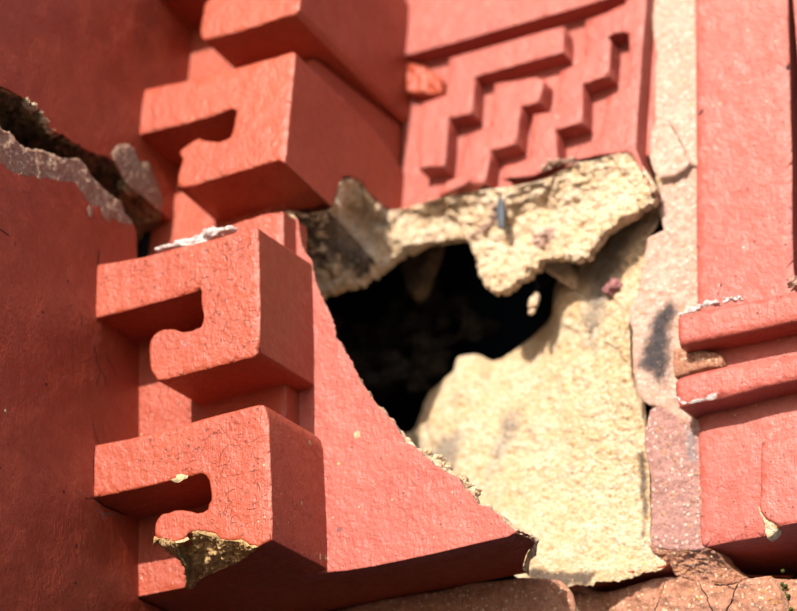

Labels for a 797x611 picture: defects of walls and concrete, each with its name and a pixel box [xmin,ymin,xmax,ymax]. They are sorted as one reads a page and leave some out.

spalling [335,329,524,532]
spalling [153,530,259,589]
crack [655,575,742,611]